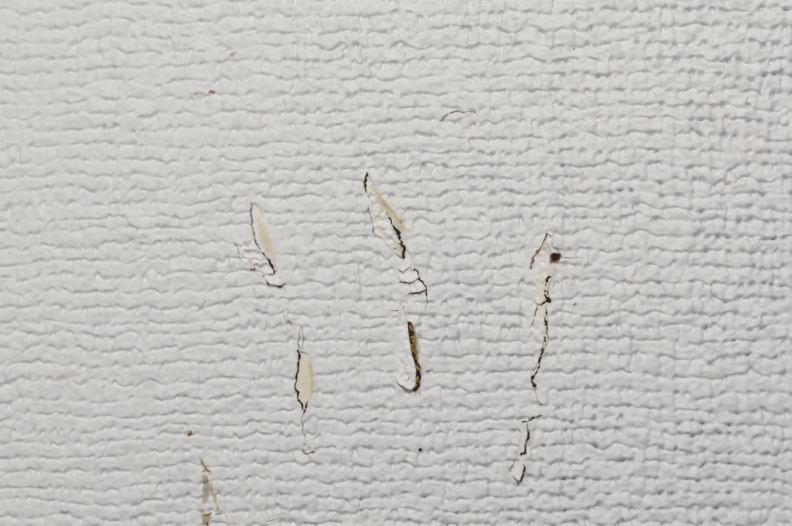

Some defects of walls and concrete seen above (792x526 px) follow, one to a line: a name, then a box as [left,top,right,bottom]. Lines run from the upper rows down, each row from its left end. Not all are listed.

peeling [234,202,285,288]
peeling [363,172,428,311]
peeling [283,307,315,454]
peeling [390,303,421,392]
peeling [510,415,542,482]
peeling [529,233,581,405]